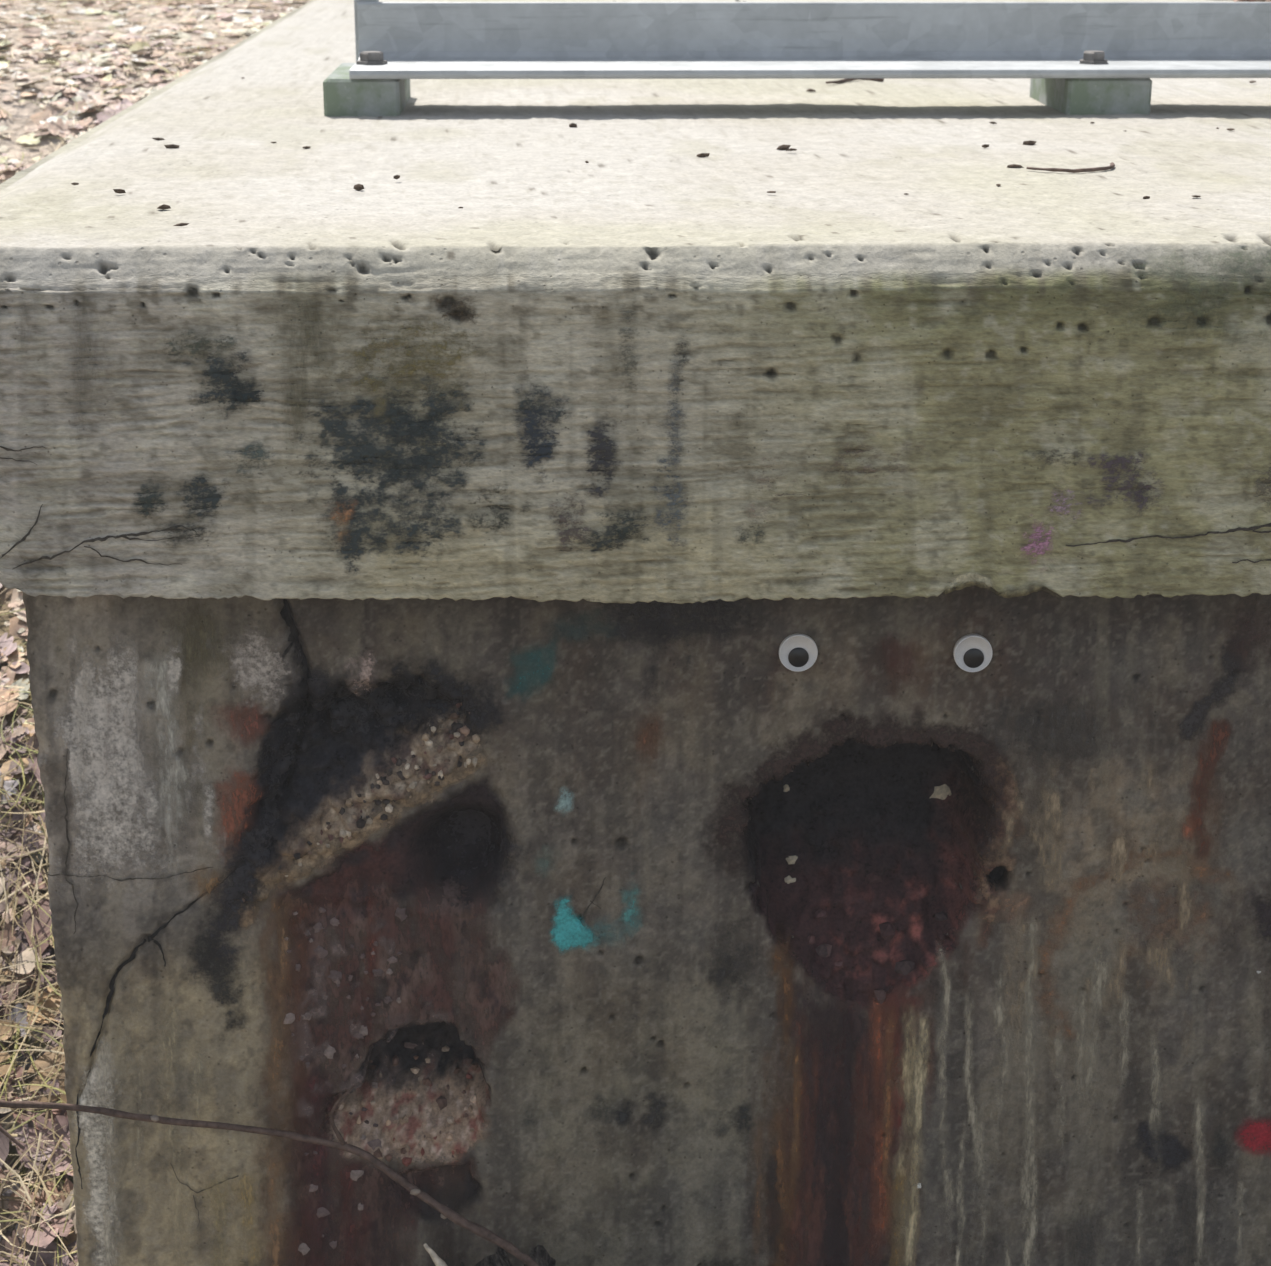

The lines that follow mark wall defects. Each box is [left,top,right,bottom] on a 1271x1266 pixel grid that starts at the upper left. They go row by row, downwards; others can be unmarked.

crack [1,504,196,569]
crack [1066,523,1271,563]
crack [75,1095,83,1189]
crack [37,744,240,1056]
spalling [234,677,507,1223]
rust [263,856,518,1266]
spalling [706,712,1023,1008]
water stain [893,949,950,1266]
water stain [943,1006,983,1226]
water stain [994,918,1037,1266]
water stain [1077,947,1129,1081]
water stain [1136,1045,1228,1170]